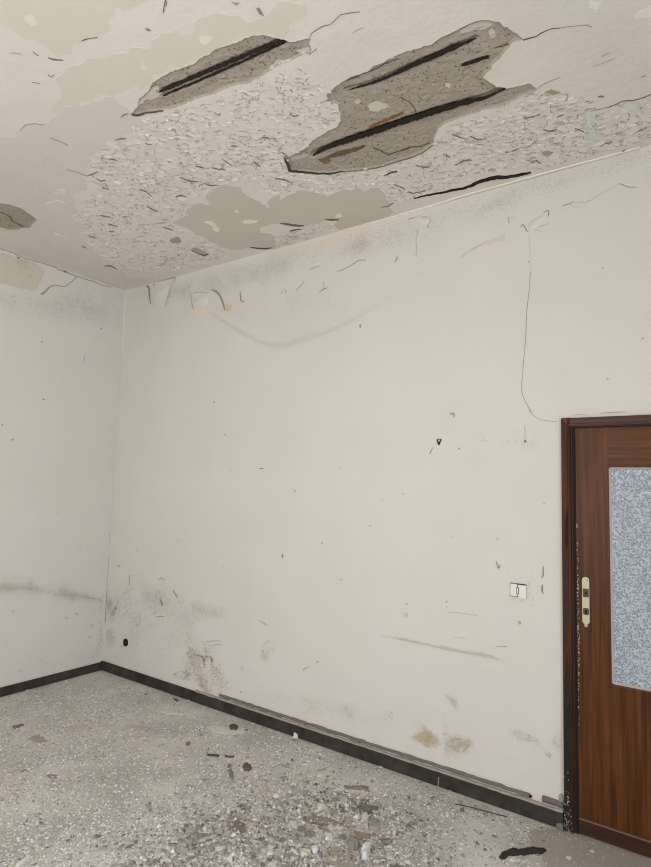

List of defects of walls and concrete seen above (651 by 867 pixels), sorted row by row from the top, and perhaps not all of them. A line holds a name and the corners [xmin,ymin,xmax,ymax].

spalling [87,20,651,250]
spalling [0,203,37,230]
crack [381,172,531,262]
crack [521,272,554,439]
water stain [0,569,228,695]